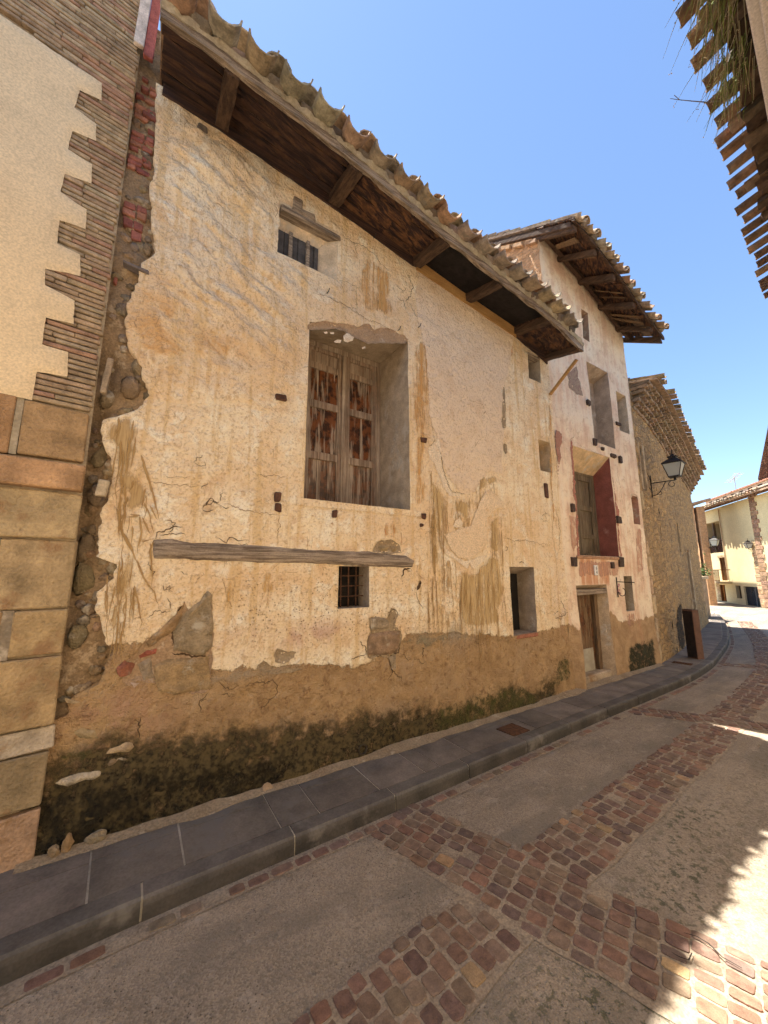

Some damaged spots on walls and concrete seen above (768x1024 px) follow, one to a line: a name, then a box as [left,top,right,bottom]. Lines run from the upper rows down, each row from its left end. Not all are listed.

flaking render [55,30,214,717]
flaking render [307,321,408,349]
damp [104,418,159,664]
crack [151,455,281,539]
flaking render [257,648,301,674]
damp [21,659,570,857]
flaking render [367,608,402,670]
damp [409,343,508,675]